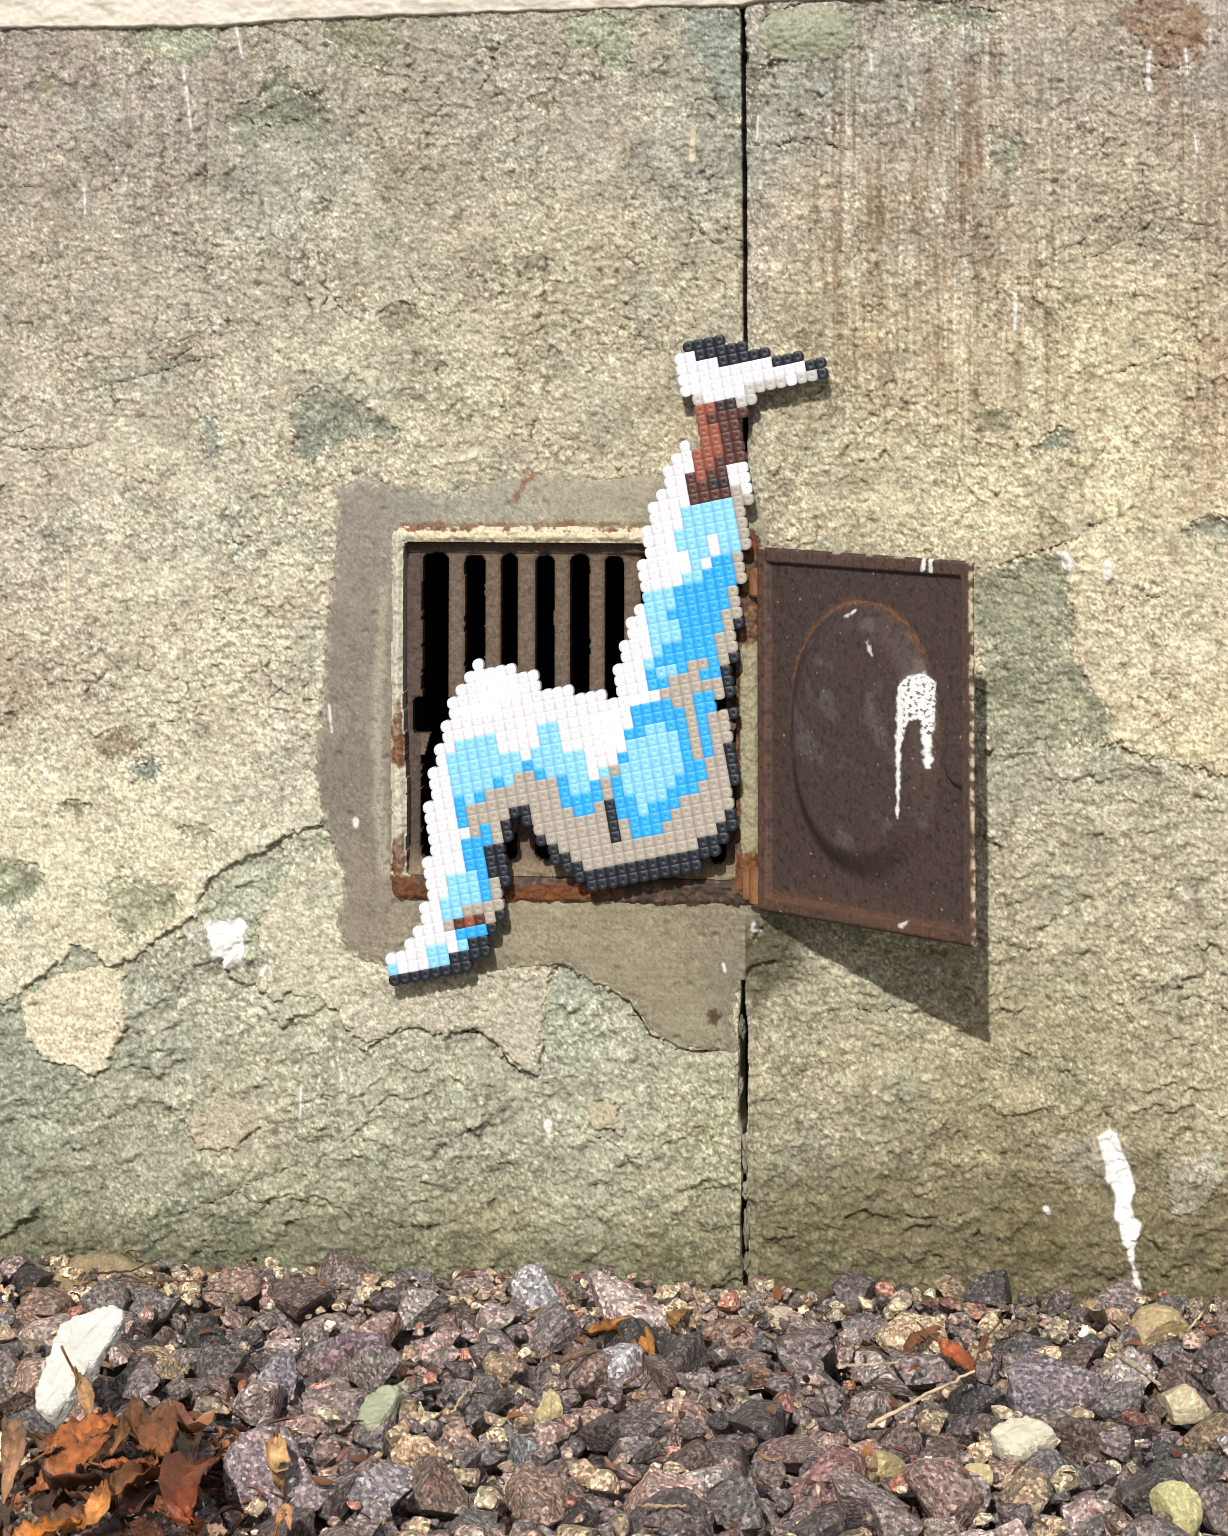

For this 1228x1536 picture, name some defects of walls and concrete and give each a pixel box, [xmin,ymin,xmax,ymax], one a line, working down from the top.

rust [741,531,759,554]
rust [392,835,429,900]
rust [505,884,612,901]
spalling [0,551,1228,1324]